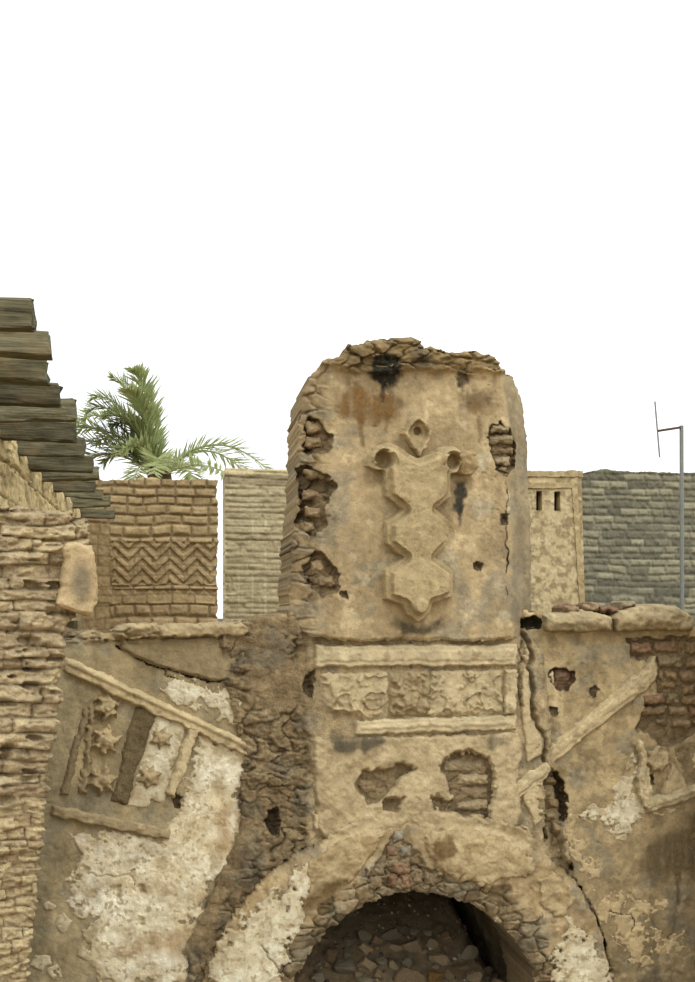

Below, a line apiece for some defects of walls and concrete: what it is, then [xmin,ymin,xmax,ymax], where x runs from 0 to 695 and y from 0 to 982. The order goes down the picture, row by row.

spalling [294,414,338,539]
damp [341,383,401,424]
damp [454,482,467,514]
spalling [487,420,516,476]
flaking render [520,615,542,763]
spalling [625,635,695,746]
spalling [354,763,422,812]
spalling [431,750,493,819]
flaking render [43,716,245,982]
flaking render [208,863,311,982]
flaking render [518,752,687,982]
crack [594,911,635,953]